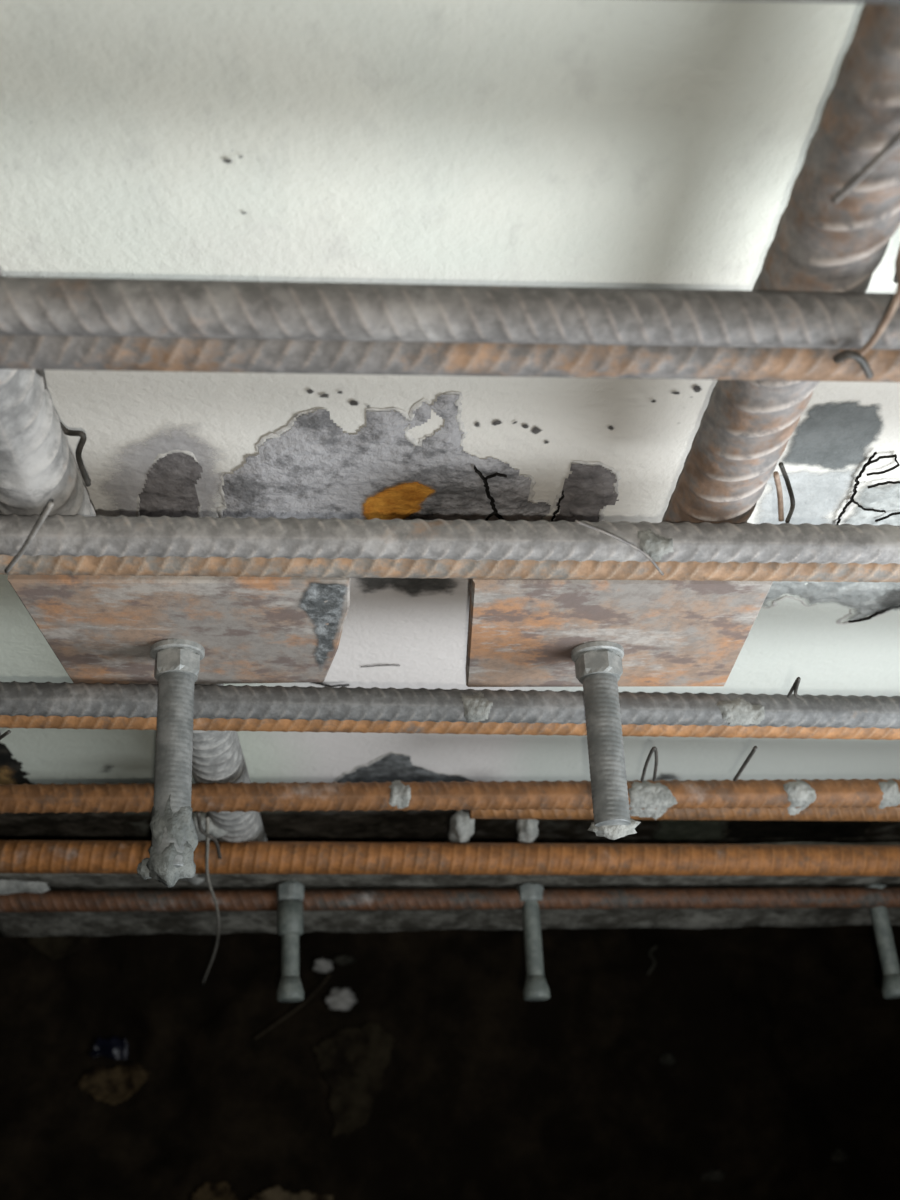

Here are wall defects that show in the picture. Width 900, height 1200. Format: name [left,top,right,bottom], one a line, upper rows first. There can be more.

spalling [0,0,900,625]
rust [363,482,434,520]
crack [836,452,900,525]